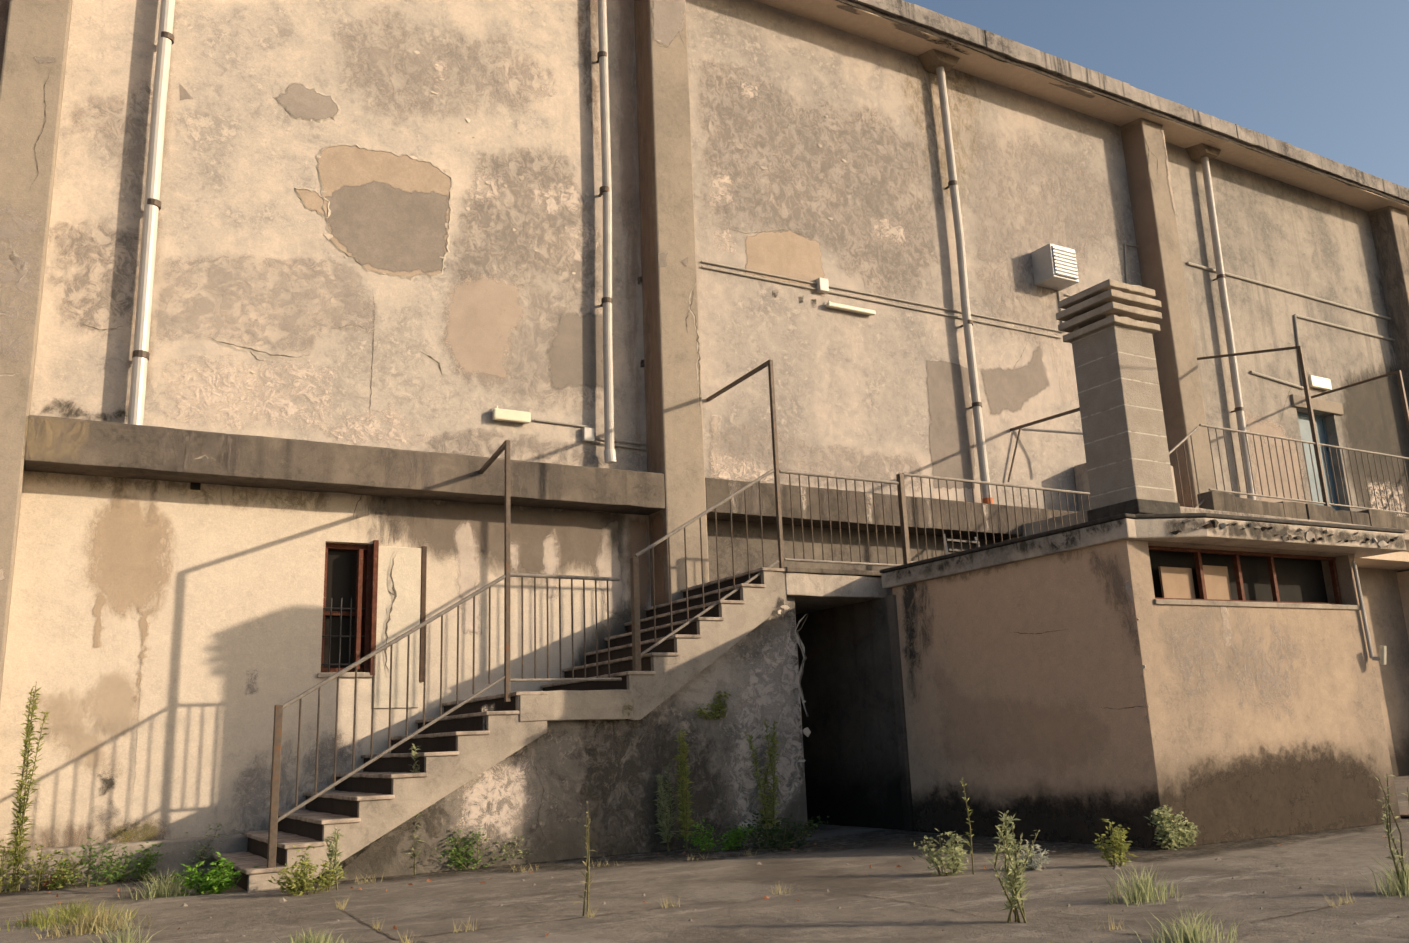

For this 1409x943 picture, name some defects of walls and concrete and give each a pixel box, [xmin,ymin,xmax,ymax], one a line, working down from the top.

crack [30,71,51,188]
spalling [273,82,341,123]
spalling [294,143,454,281]
damp [326,403,625,633]
damp [91,480,170,701]
crack [381,551,397,678]
damp [912,746,1383,850]